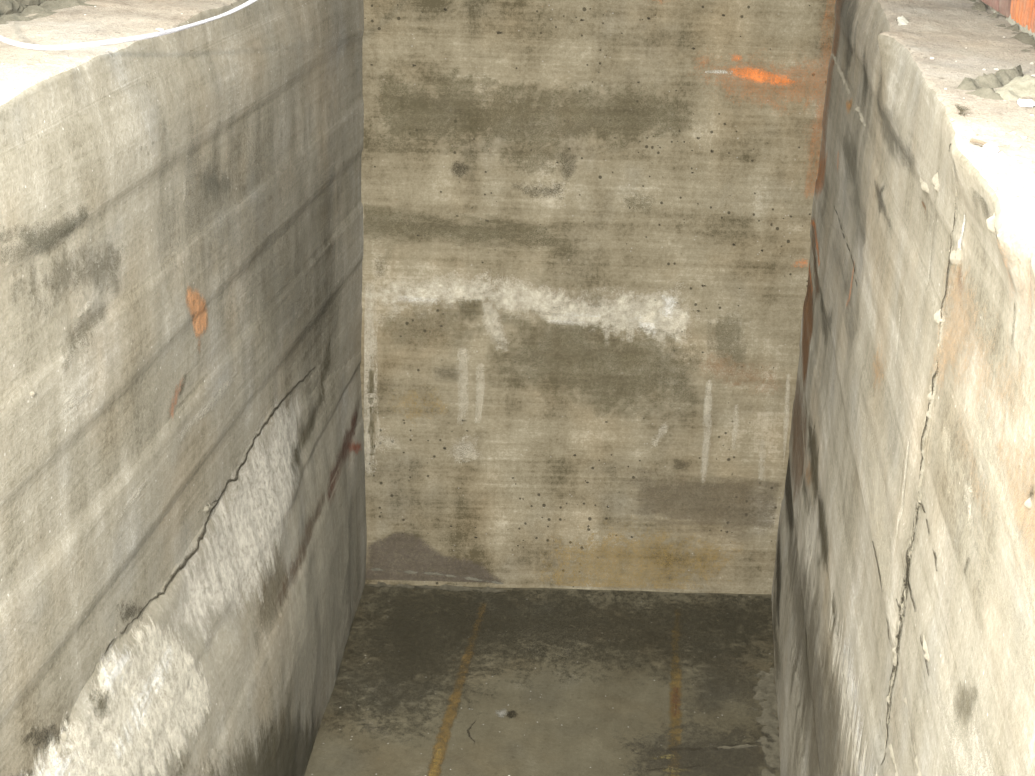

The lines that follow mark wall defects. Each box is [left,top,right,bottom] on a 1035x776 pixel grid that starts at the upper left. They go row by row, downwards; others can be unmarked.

water stain [367,65,699,201]
water stain [803,0,917,401]
crack [102,368,315,657]
water stain [0,96,878,776]
crack [872,144,965,764]